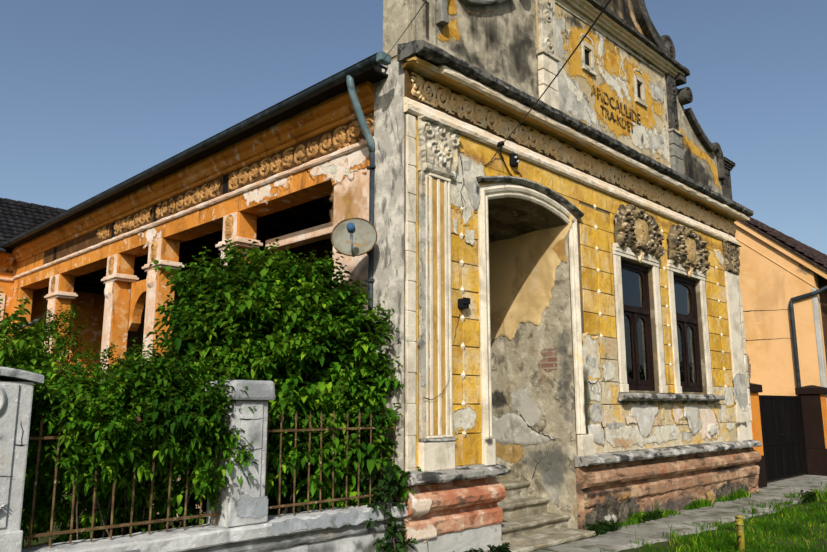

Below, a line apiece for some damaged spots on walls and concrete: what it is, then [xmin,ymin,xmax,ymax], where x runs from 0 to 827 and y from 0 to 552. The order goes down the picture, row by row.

water stain [453,41,486,72]
water stain [487,24,496,47]
water stain [510,28,532,77]
flaking render [552,12,616,139]
peeling [595,30,632,105]
peeling [241,175,293,208]
peeling [310,138,369,185]
flaking render [627,121,671,163]
water stain [684,150,711,189]
flaking render [492,391,507,407]
flaking render [582,332,751,448]
flaking render [405,493,437,547]